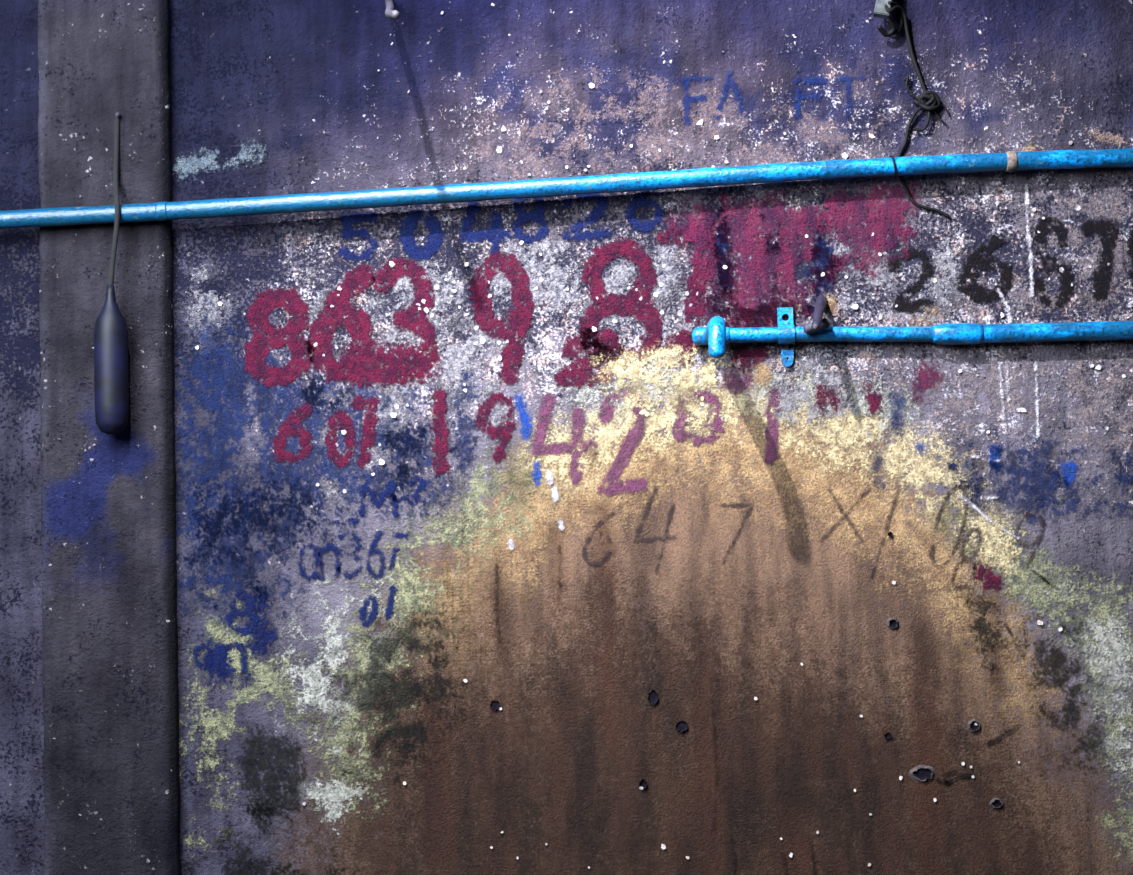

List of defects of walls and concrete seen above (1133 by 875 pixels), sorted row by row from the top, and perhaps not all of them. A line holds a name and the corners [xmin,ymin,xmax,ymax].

damp [179,360,1133,875]